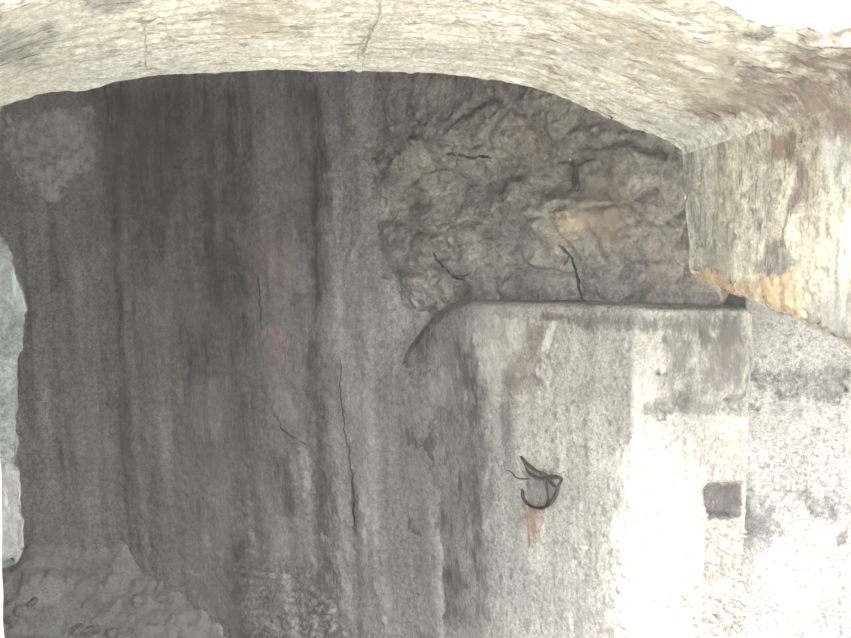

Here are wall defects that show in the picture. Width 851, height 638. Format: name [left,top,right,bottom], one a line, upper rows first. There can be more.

crack [357,0,383,67]
damp [296,86,332,280]
crack [256,276,264,333]
damp [185,384,250,638]
damp [257,457,304,638]
damp [307,345,330,536]
crack [339,358,356,531]
damp [345,376,371,596]
corrosion [525,471,554,547]